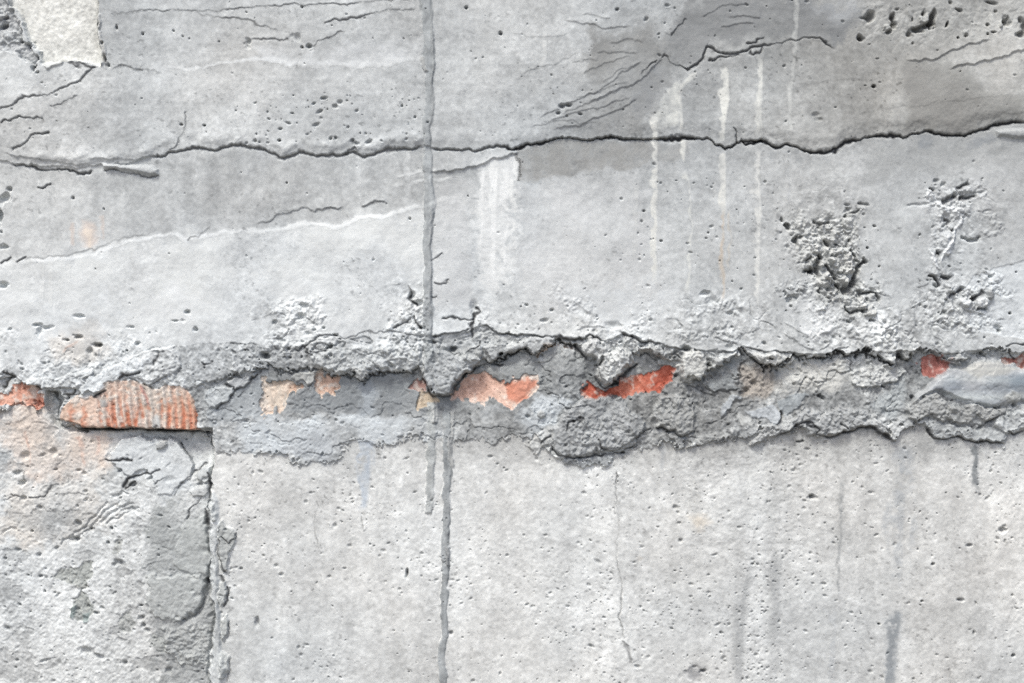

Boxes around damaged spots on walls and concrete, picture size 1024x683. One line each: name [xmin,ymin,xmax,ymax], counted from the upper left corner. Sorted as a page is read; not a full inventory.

peeling [0,0,107,72]
water stain [30,60,697,317]
crack [0,0,1024,190]
water stain [716,65,733,301]
water stain [748,55,803,308]
water stain [785,0,801,135]
spalling [782,202,884,323]
spalling [915,178,1024,339]
crack [1,252,962,682]